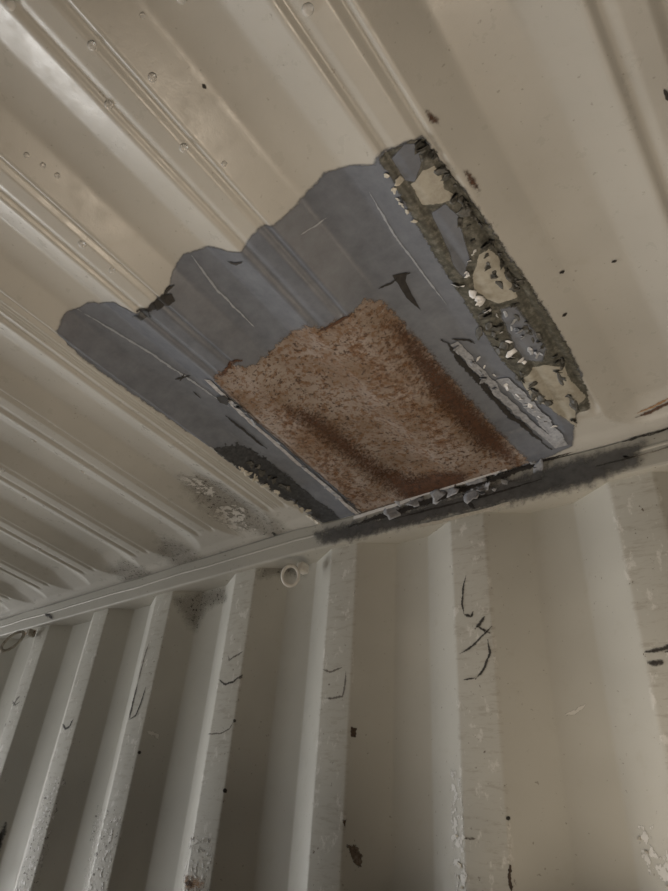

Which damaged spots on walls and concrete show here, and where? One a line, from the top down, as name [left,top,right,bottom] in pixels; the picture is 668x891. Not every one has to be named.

peeling [379,138,590,427]
corrosion [214,298,529,513]
peeling [207,504,256,533]
peeling [214,442,339,525]
peeling [637,826,668,891]